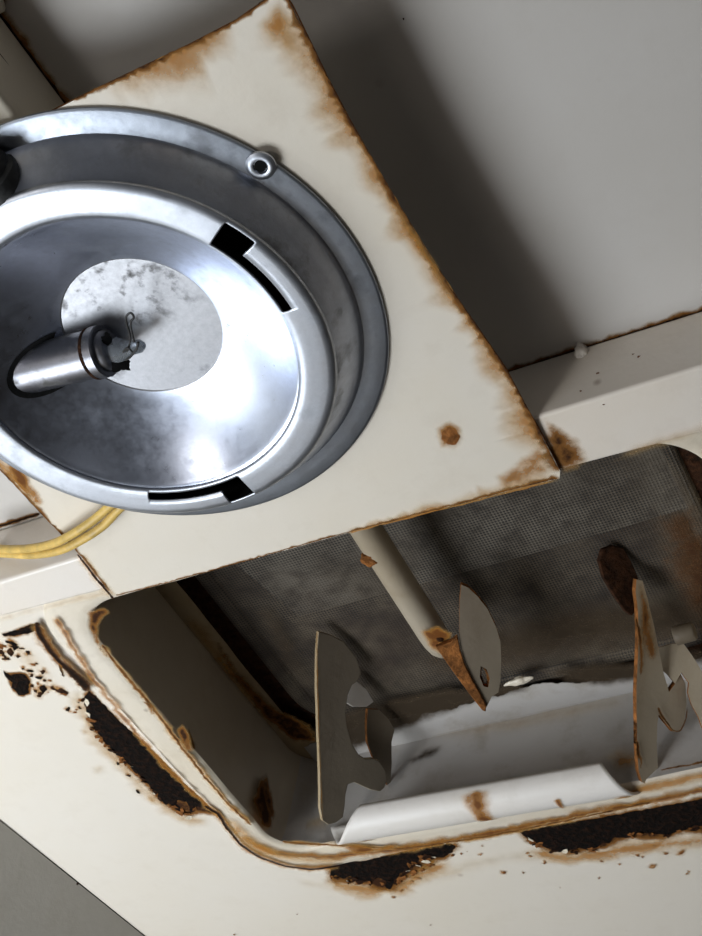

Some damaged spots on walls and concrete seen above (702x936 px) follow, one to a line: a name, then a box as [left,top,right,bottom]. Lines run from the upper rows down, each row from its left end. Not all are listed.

corrosion [0,0,702,596]
corrosion [5,666,61,697]
corrosion [54,619,216,816]
corrosion [88,609,702,898]
corrosion [636,591,655,674]